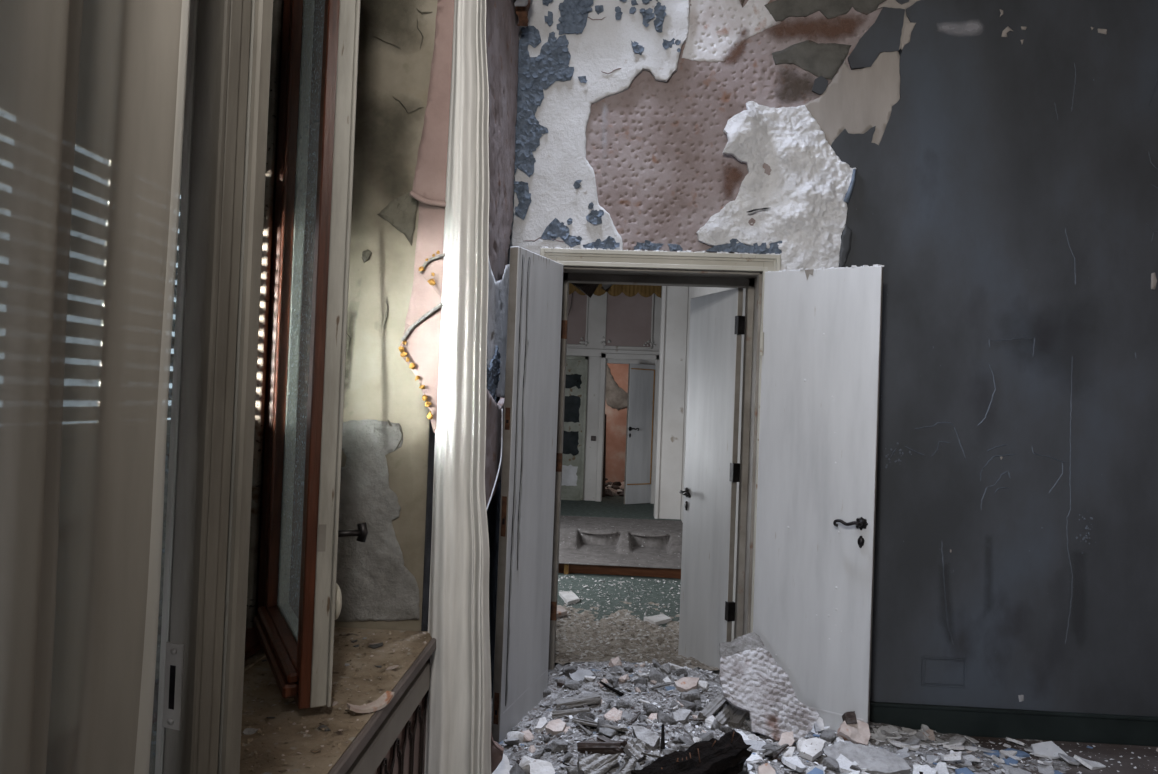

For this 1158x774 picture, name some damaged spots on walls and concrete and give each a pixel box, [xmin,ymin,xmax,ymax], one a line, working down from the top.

spalling [485,0,920,699]
crack [890,337,1073,645]